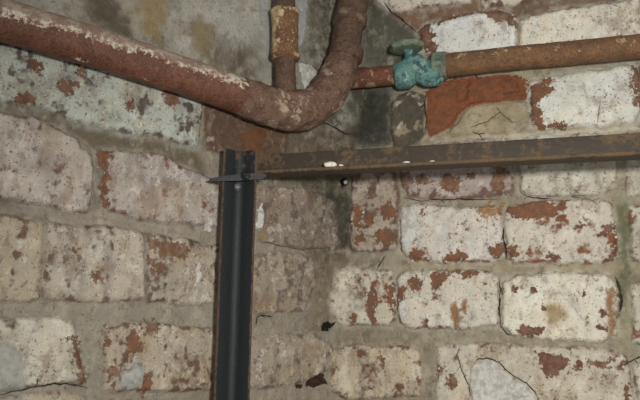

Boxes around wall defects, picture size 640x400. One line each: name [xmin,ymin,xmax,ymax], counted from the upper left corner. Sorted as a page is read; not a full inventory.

crack [471,107,512,140]
spalling [422,75,568,136]
peeling [350,198,399,247]
peeling [364,274,423,323]
peeling [430,248,480,295]
peeling [487,242,521,261]
crack [498,280,511,336]
peeling [469,201,563,222]
peeling [594,220,619,262]
crack [615,277,623,312]
crack [456,346,471,396]
crack [477,357,539,399]